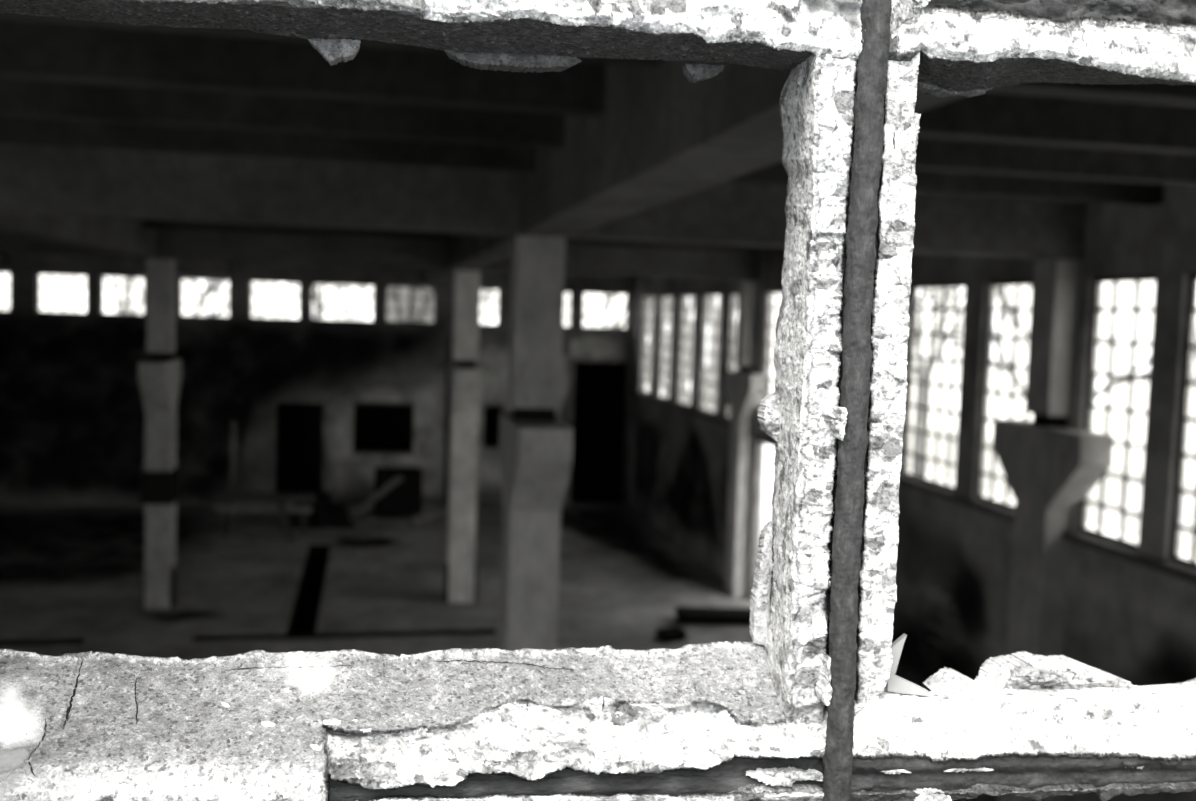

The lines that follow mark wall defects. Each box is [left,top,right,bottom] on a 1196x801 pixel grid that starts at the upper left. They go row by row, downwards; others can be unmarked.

damp [0,689,40,799]
spalling [326,0,862,801]